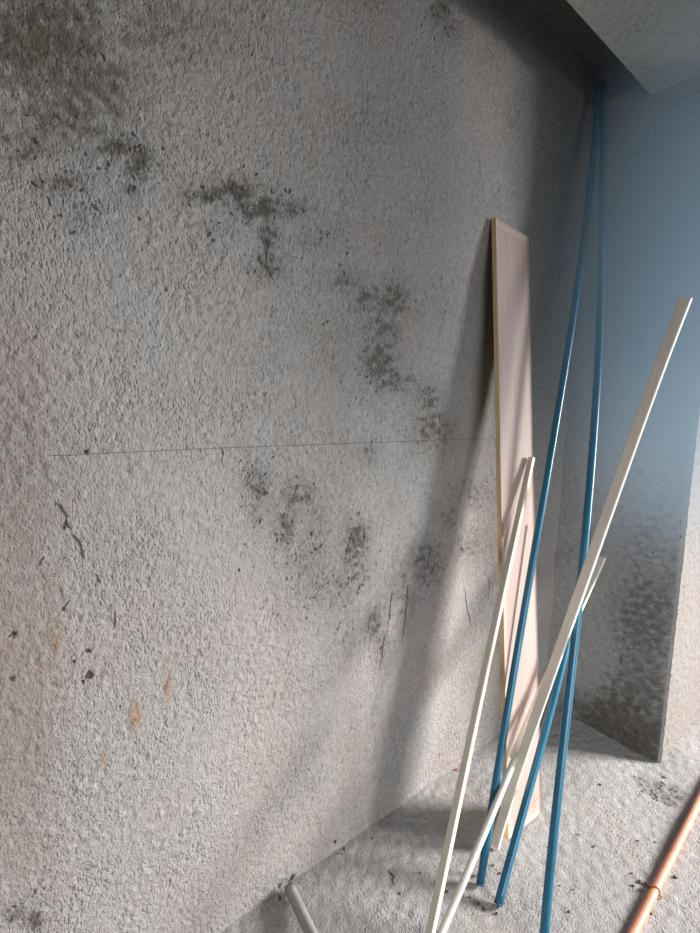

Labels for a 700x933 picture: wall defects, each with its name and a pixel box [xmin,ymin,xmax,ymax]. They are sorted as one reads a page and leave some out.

water stain [0,1,118,130]
water stain [47,169,99,218]
water stain [89,131,165,194]
water stain [179,164,306,287]
water stain [348,279,426,393]
water stain [409,378,456,454]
crack [58,503,100,583]
water stain [241,456,275,498]
water stain [275,475,326,565]
water stain [287,511,377,619]
water stain [573,577,670,761]